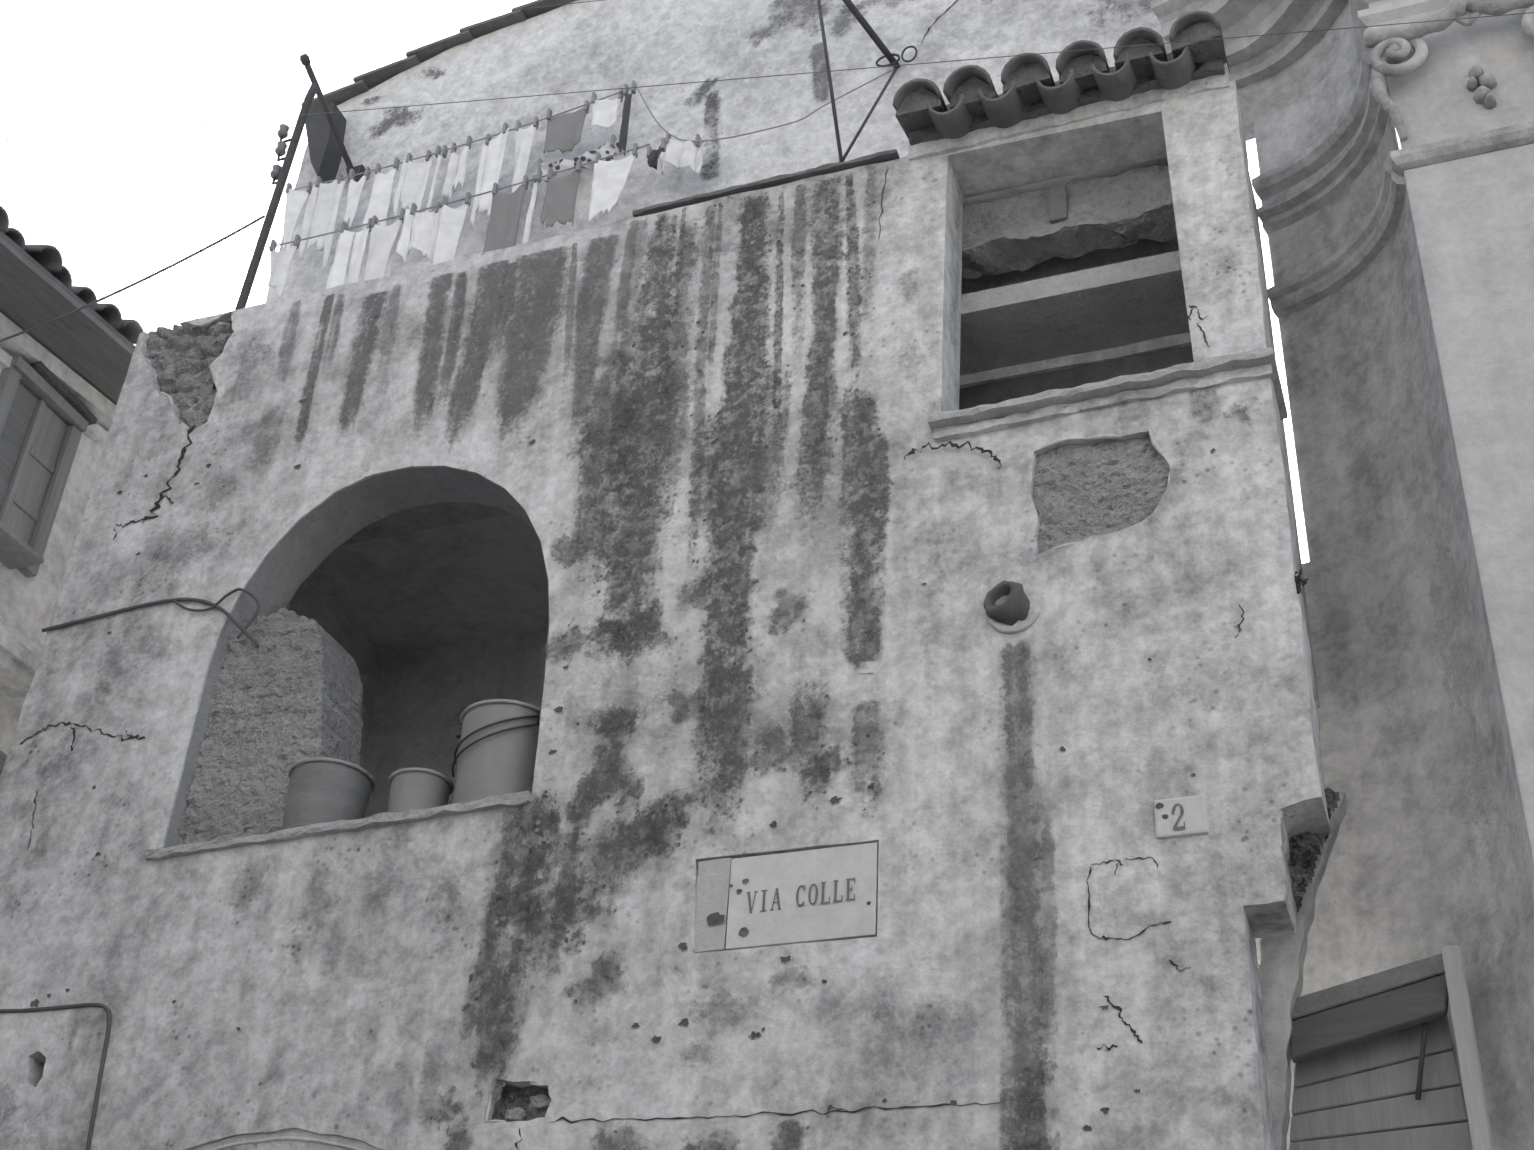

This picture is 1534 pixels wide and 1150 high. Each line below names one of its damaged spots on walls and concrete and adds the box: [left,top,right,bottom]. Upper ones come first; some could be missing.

damp [687,78,720,179]
flaking render [141,314,234,430]
damp [296,291,386,442]
crack [113,425,195,540]
crack [904,441,1001,469]
flaking render [1033,429,1170,554]
damp [414,177,893,1098]
crack [20,722,145,751]
damp [1000,642,1059,1150]
flaking render [484,1081,551,1123]